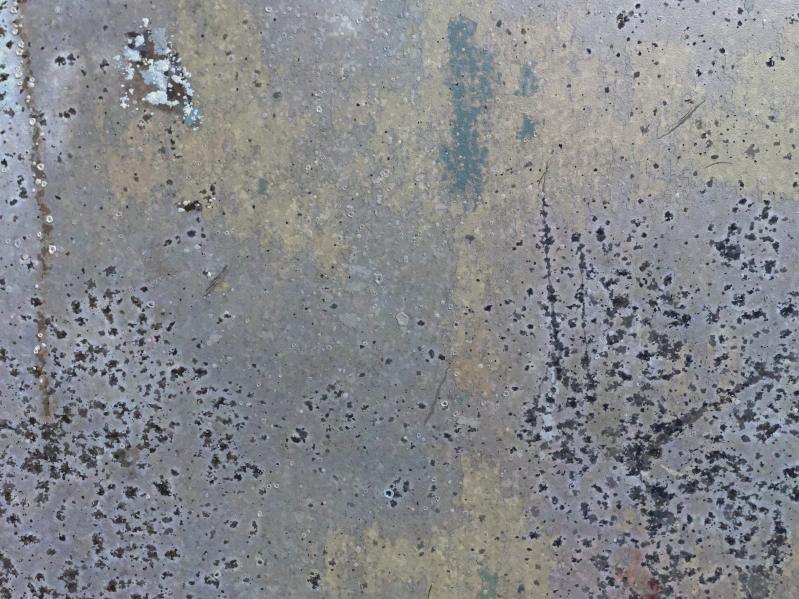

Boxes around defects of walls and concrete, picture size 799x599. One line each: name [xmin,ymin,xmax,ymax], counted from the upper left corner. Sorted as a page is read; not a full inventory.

water stain [726,0,759,26]
peeling [108,18,203,130]
mould [0,102,52,143]
corrosion [13,0,57,426]
mould [509,281,533,322]
water stain [480,328,518,391]
mould [303,383,410,438]
mould [285,428,308,447]
mould [569,530,608,553]